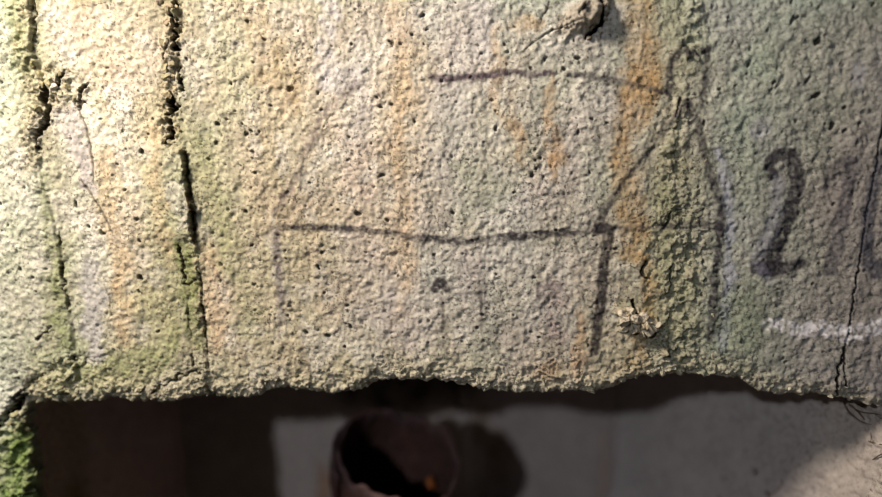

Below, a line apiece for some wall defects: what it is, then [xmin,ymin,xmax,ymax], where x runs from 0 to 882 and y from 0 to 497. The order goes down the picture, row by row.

crack [28,0,39,53]
crack [32,69,90,156]
crack [150,0,210,399]
corrosion [605,0,666,315]
crack [874,114,882,151]
spalling [0,138,882,435]
crack [849,256,861,324]
crack [834,345,849,397]